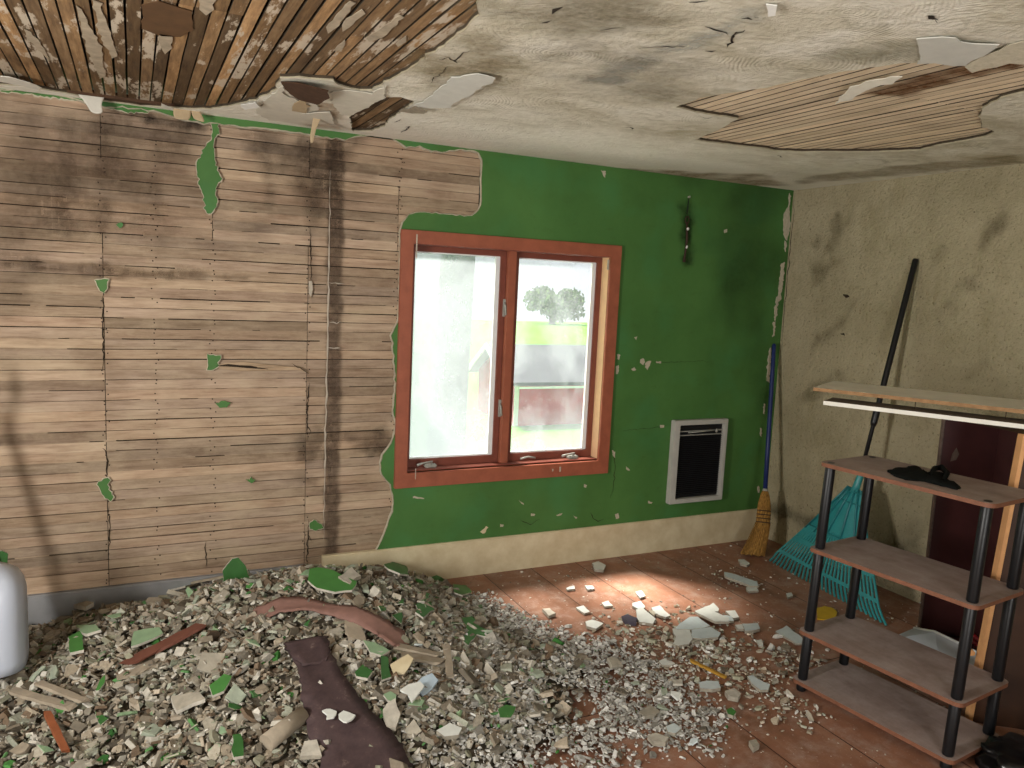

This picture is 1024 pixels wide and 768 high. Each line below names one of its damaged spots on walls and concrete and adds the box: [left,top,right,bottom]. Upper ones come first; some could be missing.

spalling [677,36,1024,152]
crack [101,296,109,369]
spalling [0,0,495,595]
damp [289,138,344,555]
spalling [766,193,795,383]